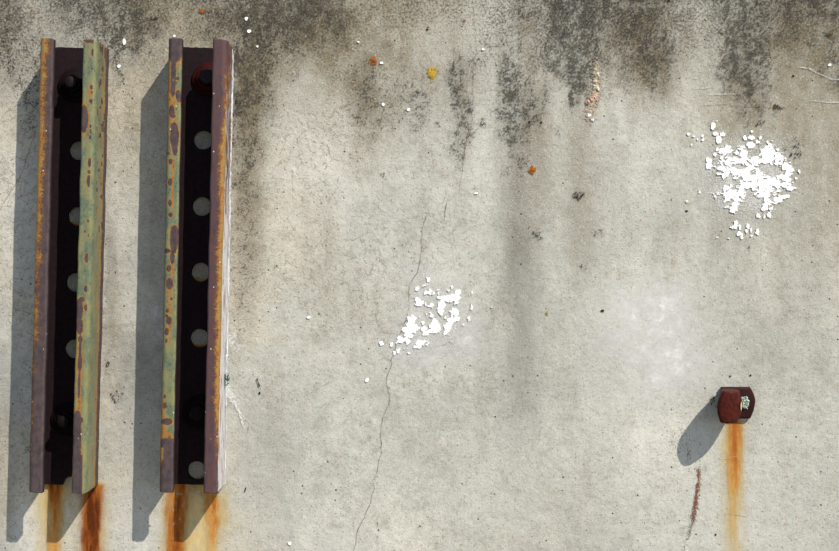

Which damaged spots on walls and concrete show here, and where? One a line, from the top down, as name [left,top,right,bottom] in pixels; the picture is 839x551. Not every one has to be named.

leakage [0,0,41,130]
leakage [46,0,347,215]
leakage [351,65,430,136]
leakage [446,57,481,170]
leakage [490,0,683,177]
leakage [713,0,839,128]
peeling [687,120,800,239]
peeling [379,277,473,355]
corrosion [39,482,69,551]
corrosion [81,482,103,551]
corrosion [165,476,226,551]
corrosion [722,420,743,541]